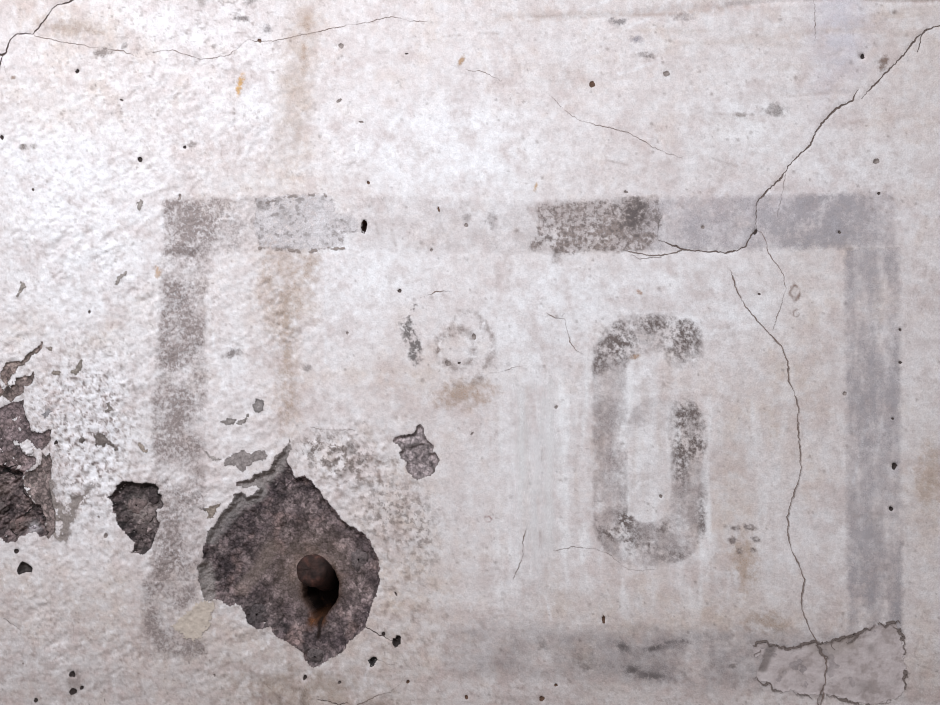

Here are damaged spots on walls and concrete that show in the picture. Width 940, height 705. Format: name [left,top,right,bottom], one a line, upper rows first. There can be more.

crack [0,0,425,79]
crack [659,25,940,705]
flaking render [0,341,95,575]
spalling [393,424,439,480]
spalling [107,481,163,555]
spalling [197,437,380,680]
flaking render [752,620,908,705]